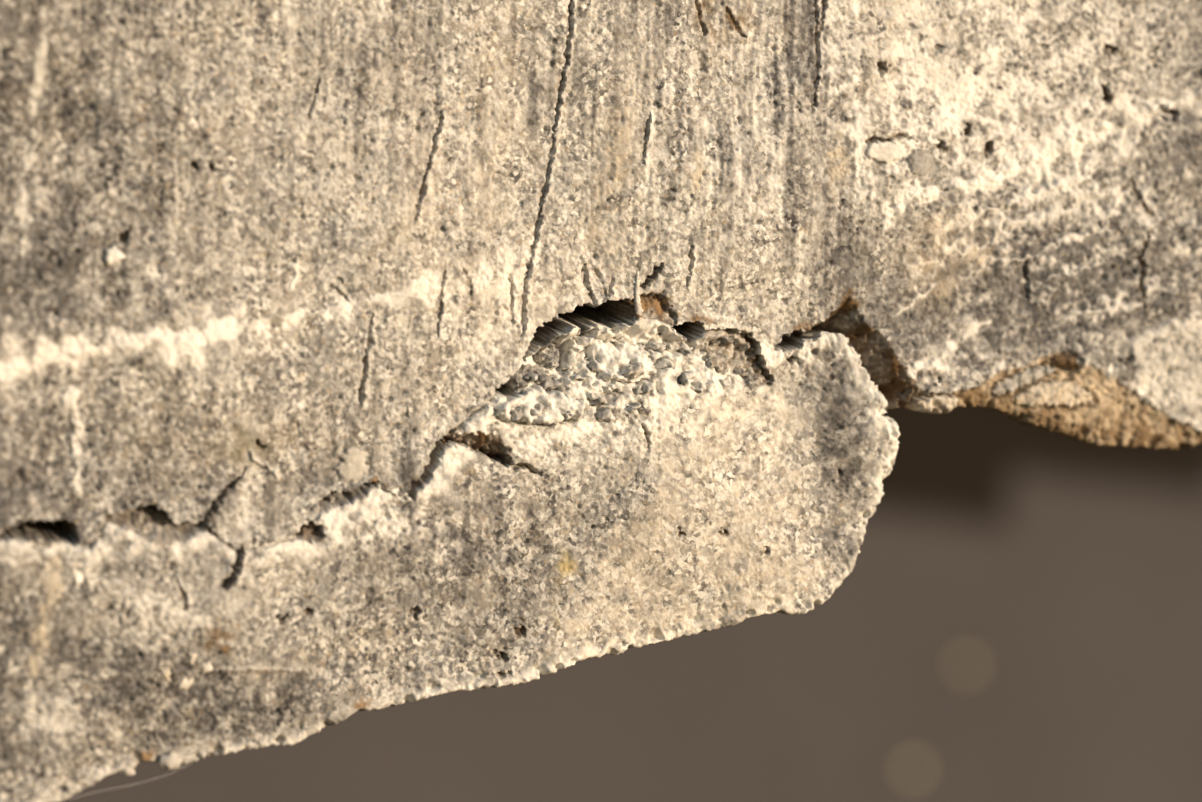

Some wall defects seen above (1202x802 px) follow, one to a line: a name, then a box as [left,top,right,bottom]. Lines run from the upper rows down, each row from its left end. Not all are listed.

crack [0,0,705,613]
spalling [0,320,901,802]
crack [774,289,927,413]
spalling [904,352,1202,449]